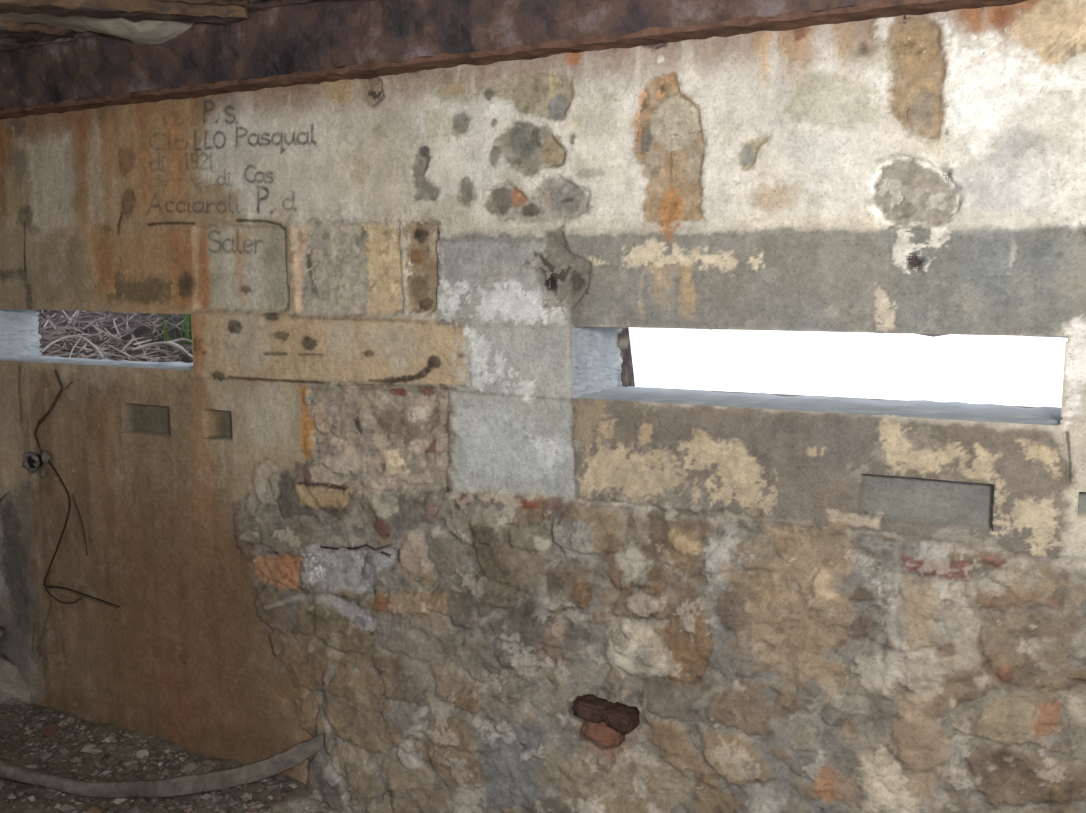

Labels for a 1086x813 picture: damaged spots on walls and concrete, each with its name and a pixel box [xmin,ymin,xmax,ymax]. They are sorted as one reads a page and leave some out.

rust [560,51,589,71]
rust [749,21,866,98]
rust [948,0,1037,45]
peeling [859,0,1086,282]
flaking render [288,42,781,520]
peeling [871,281,901,334]
rust [65,98,297,765]
peeling [804,444,827,460]
peeling [873,313,1086,562]
peeling [824,506,887,532]
flaking render [252,542,401,636]
flaking render [854,741,929,813]